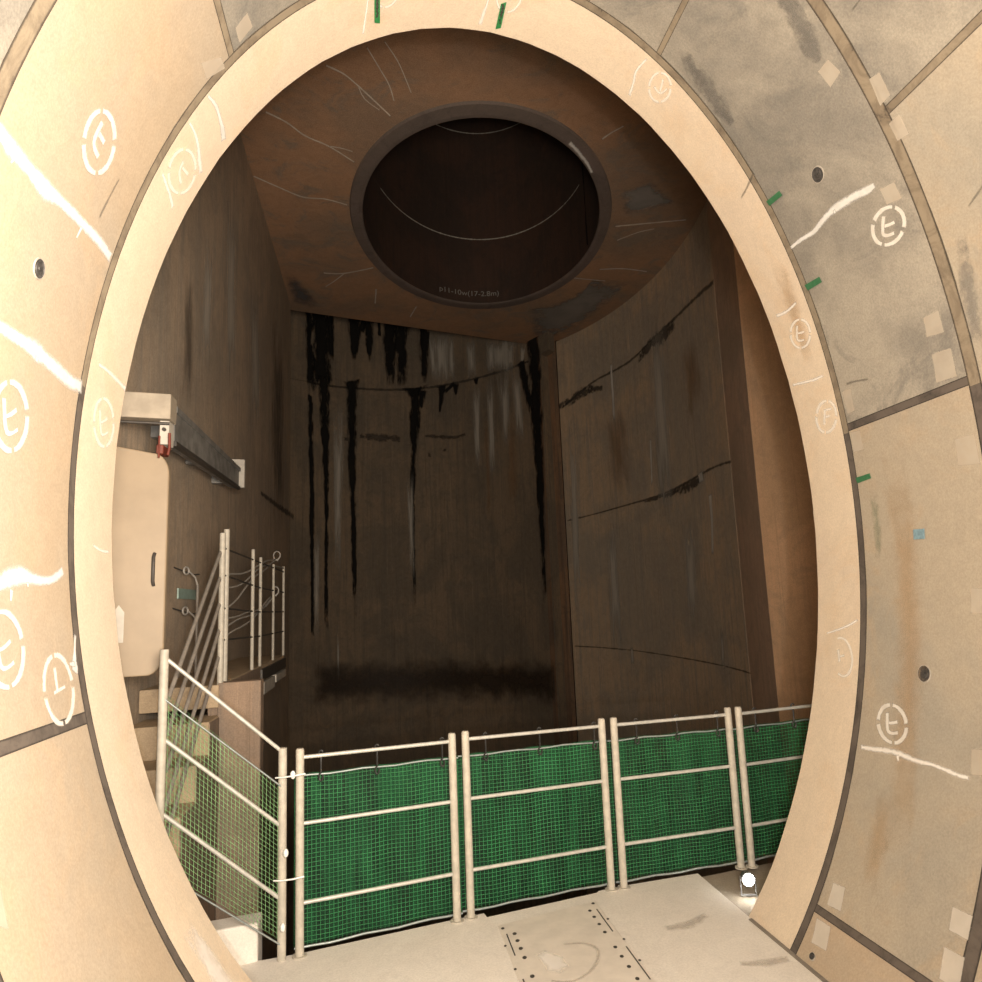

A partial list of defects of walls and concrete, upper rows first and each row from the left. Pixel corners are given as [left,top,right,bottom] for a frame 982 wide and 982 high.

water stain [291,282,359,633]
water stain [348,318,458,586]